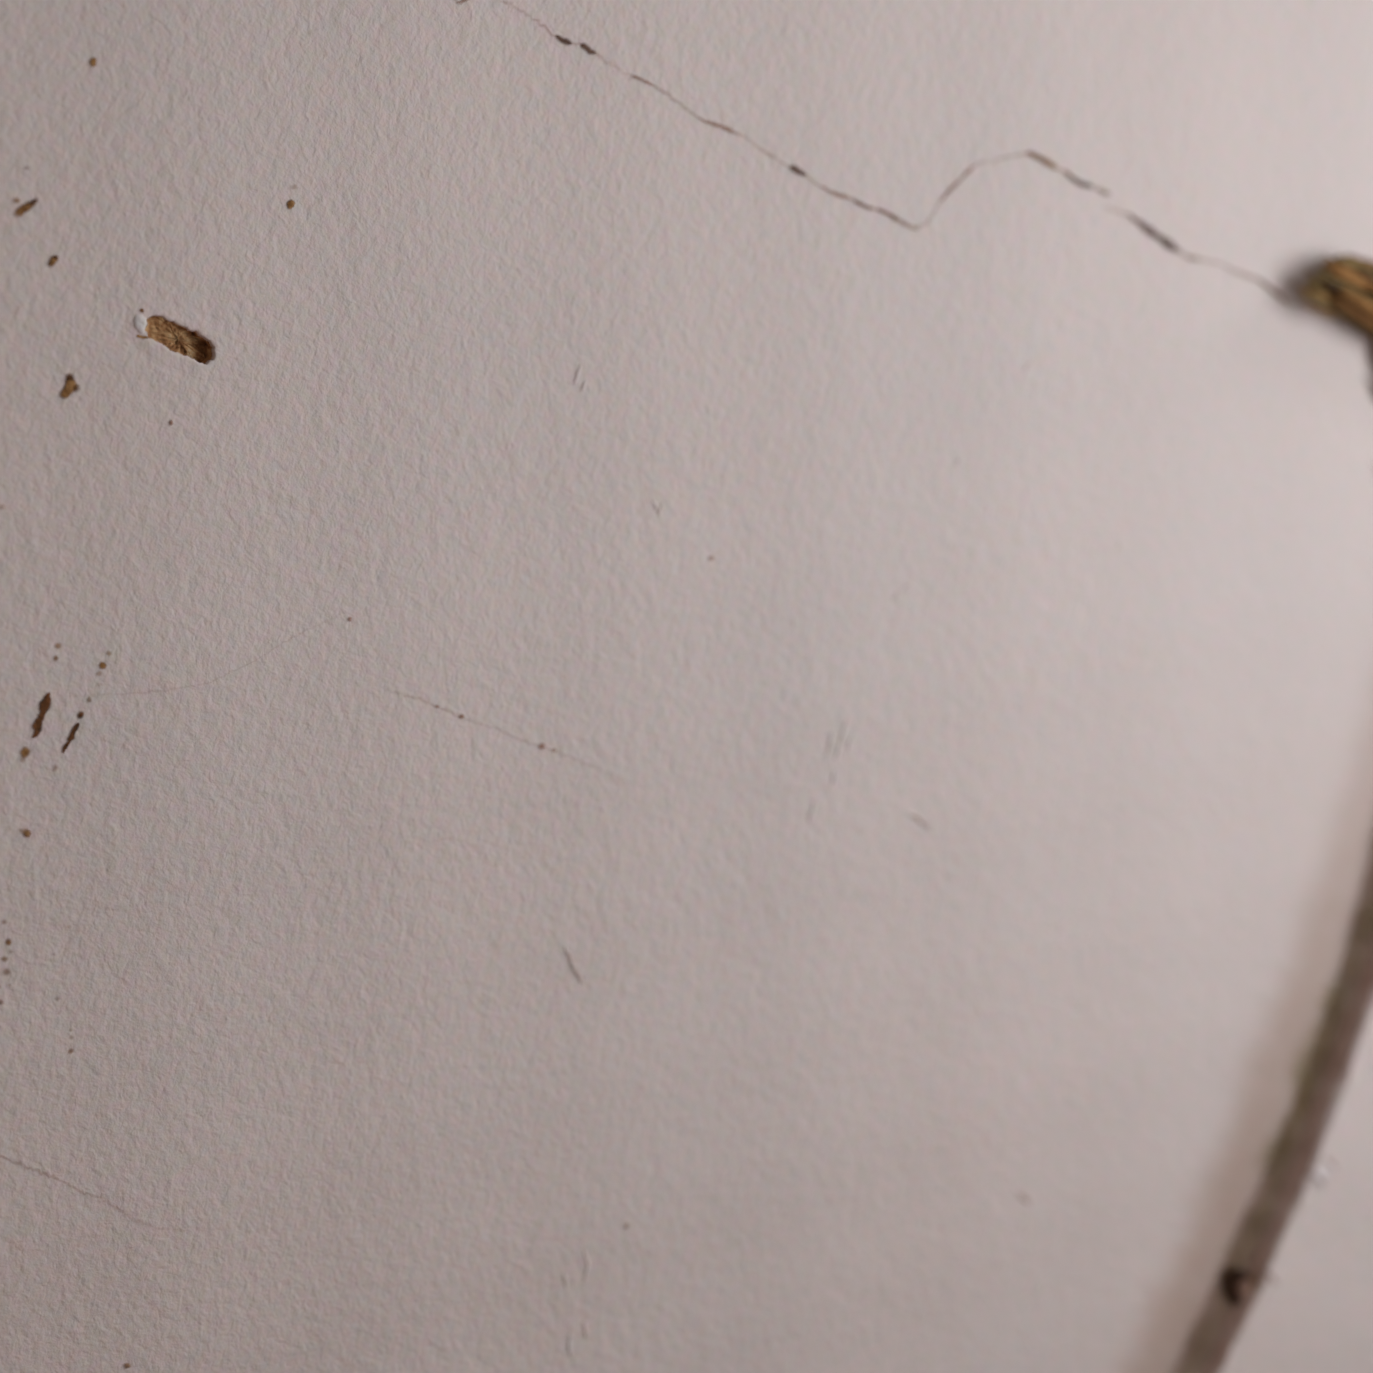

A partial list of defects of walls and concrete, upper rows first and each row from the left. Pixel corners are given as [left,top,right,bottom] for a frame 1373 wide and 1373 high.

crack [556,35,596,54]
crack [699,118,737,134]
peeling [15,199,37,216]
crack [790,166,917,229]
crack [1027,152,1180,252]
spalling [129,300,230,380]
peeling [61,375,78,398]